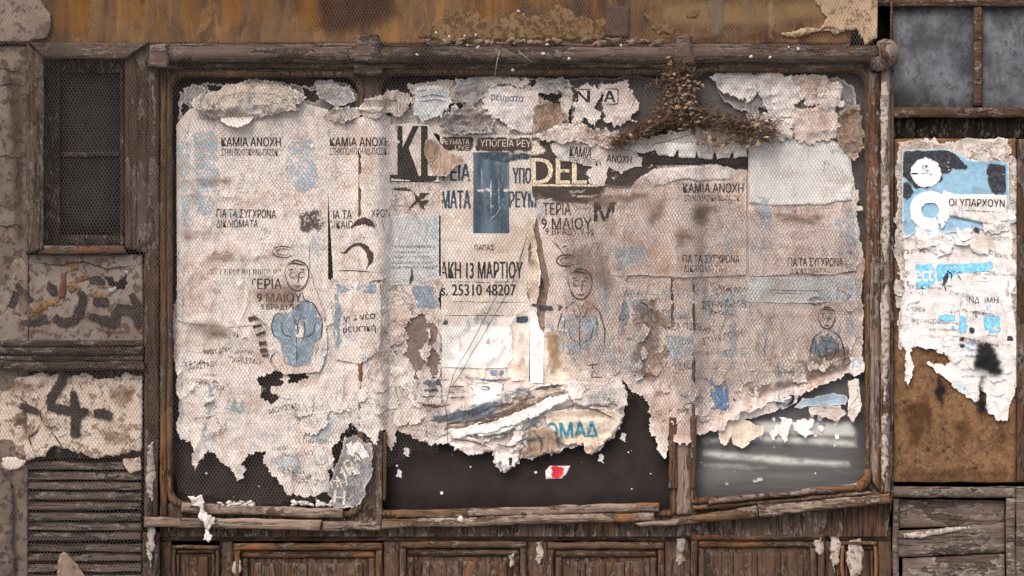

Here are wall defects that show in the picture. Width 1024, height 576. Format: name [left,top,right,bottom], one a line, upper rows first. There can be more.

flaking render [0,0,51,42]
corrosion [296,0,394,31]
peeling [418,4,676,47]
corrosion [760,30,849,40]
flaking render [781,0,878,45]
peeling [0,371,156,502]
peeling [146,527,156,568]